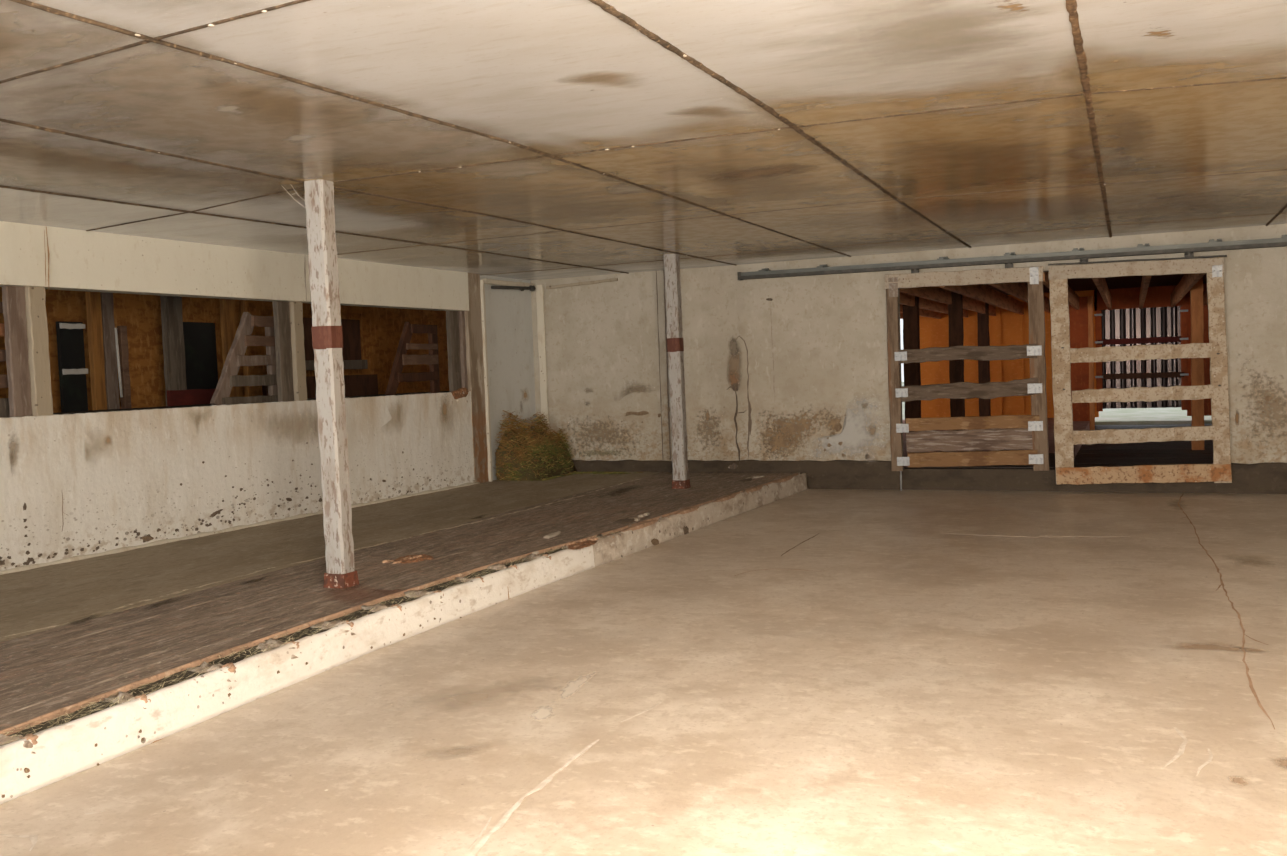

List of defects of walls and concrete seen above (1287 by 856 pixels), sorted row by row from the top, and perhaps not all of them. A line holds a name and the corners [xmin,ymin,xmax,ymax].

crack [1178,493,1275,729]